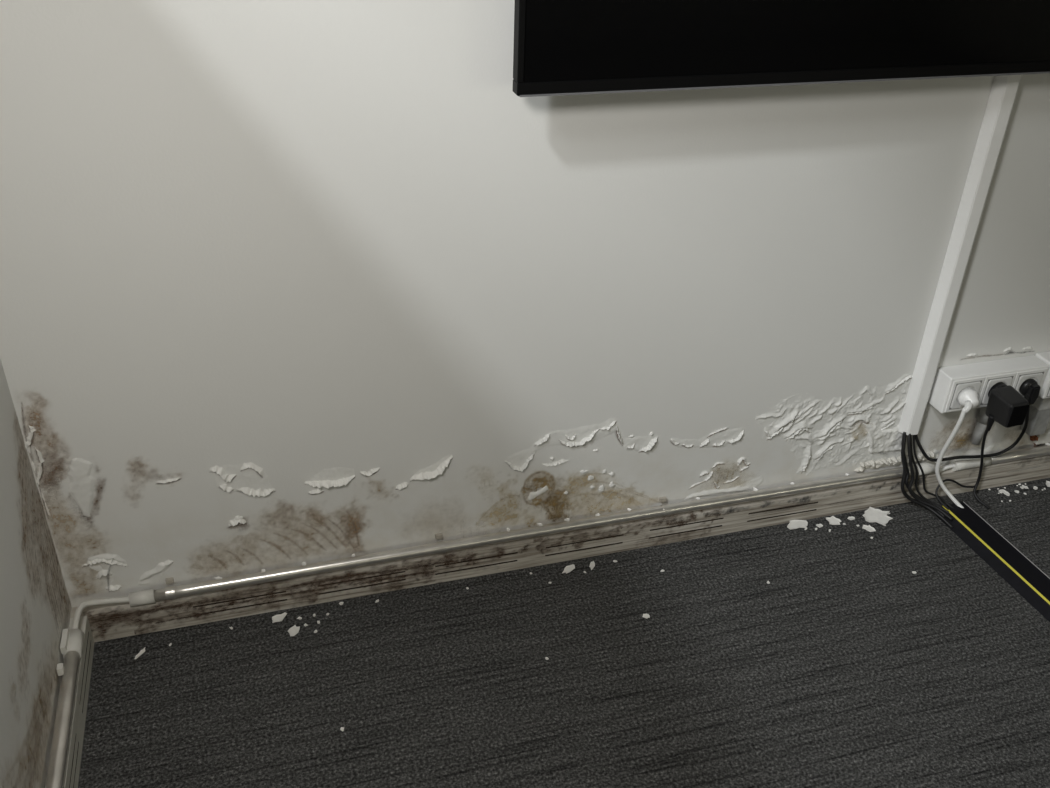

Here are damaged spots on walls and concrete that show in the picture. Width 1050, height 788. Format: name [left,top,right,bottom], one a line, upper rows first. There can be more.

peeling [67,458,103,520]
peeling [305,467,380,494]
peeling [505,418,658,472]
peeling [671,427,744,448]
peeling [684,457,764,500]
spalling [852,451,935,472]
spalling [228,516,247,526]
damp [523,507,736,554]
damp [86,553,476,637]